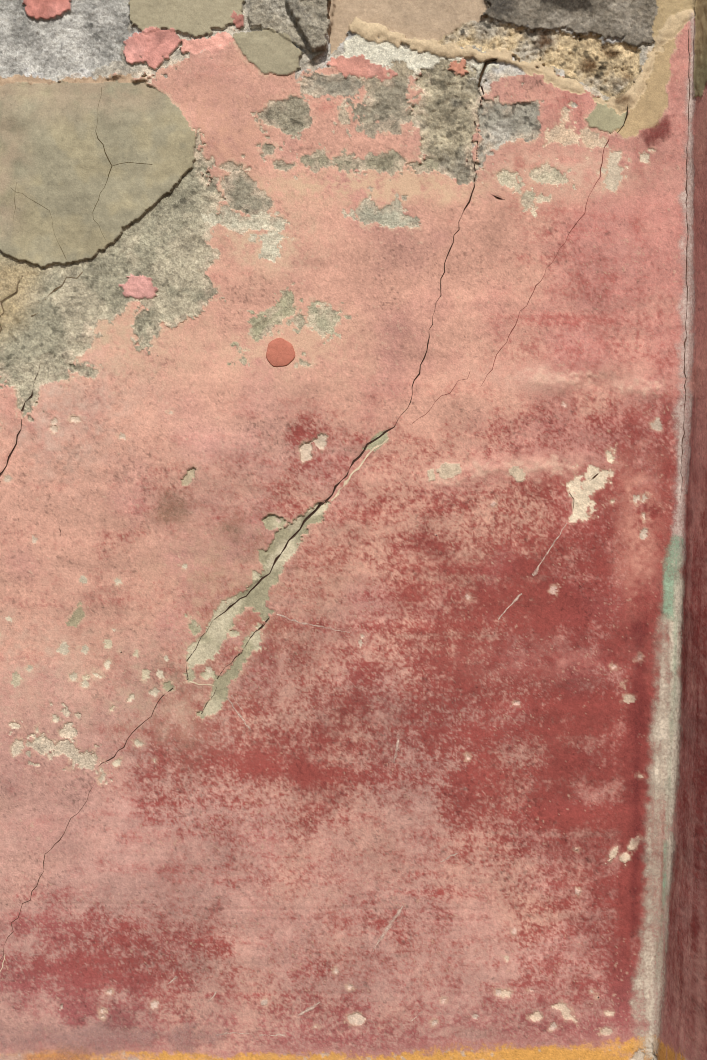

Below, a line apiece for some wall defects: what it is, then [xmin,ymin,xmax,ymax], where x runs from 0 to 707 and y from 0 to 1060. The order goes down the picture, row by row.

spalling [251,59,657,229]
spalling [0,129,294,434]
spalling [228,283,352,367]
crack [0,59,628,972]
peeling [300,434,329,463]
peeling [567,448,616,523]
water stain [631,13,695,1057]
spalling [184,502,331,719]
peeling [70,630,117,688]
peeling [143,656,175,697]
spalling [9,703,122,785]